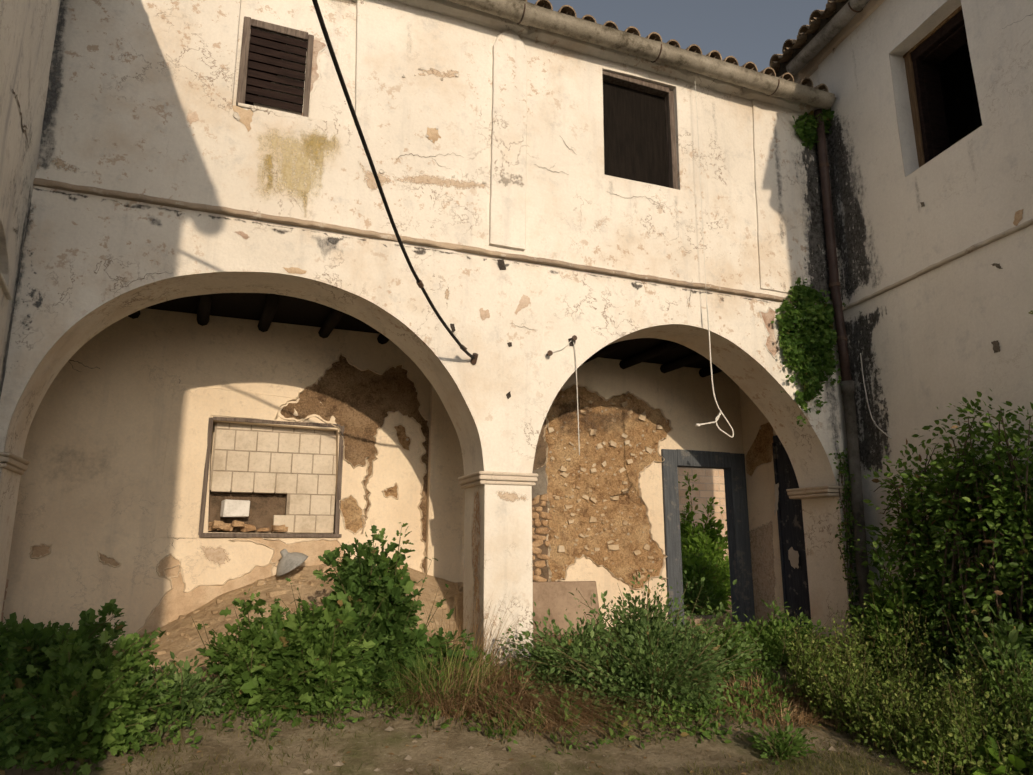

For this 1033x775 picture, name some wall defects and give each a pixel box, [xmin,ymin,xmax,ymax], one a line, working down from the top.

crack [12,89,29,148]
damp [39,0,76,171]
damp [262,135,336,197]
peeling [402,67,459,80]
peeling [362,165,524,191]
damp [796,109,876,302]
spalling [759,307,781,359]
damp [845,308,891,472]
spalling [136,353,429,637]
spalling [532,383,674,590]